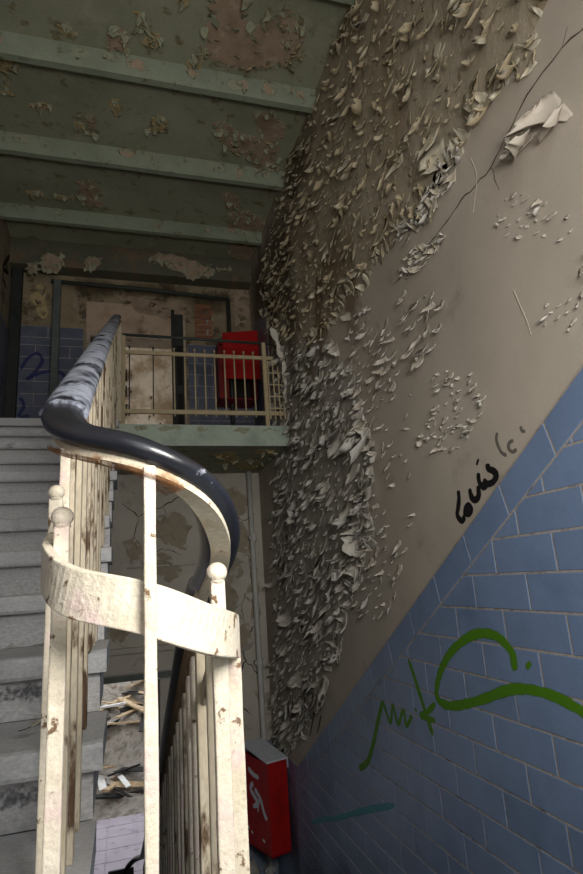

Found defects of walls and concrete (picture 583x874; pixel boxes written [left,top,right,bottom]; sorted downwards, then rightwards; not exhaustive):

crack [428,26,583,245]
peeling [499,91,573,162]
peeling [495,192,573,241]
peeling [84,256,103,273]
peeling [149,0,548,756]